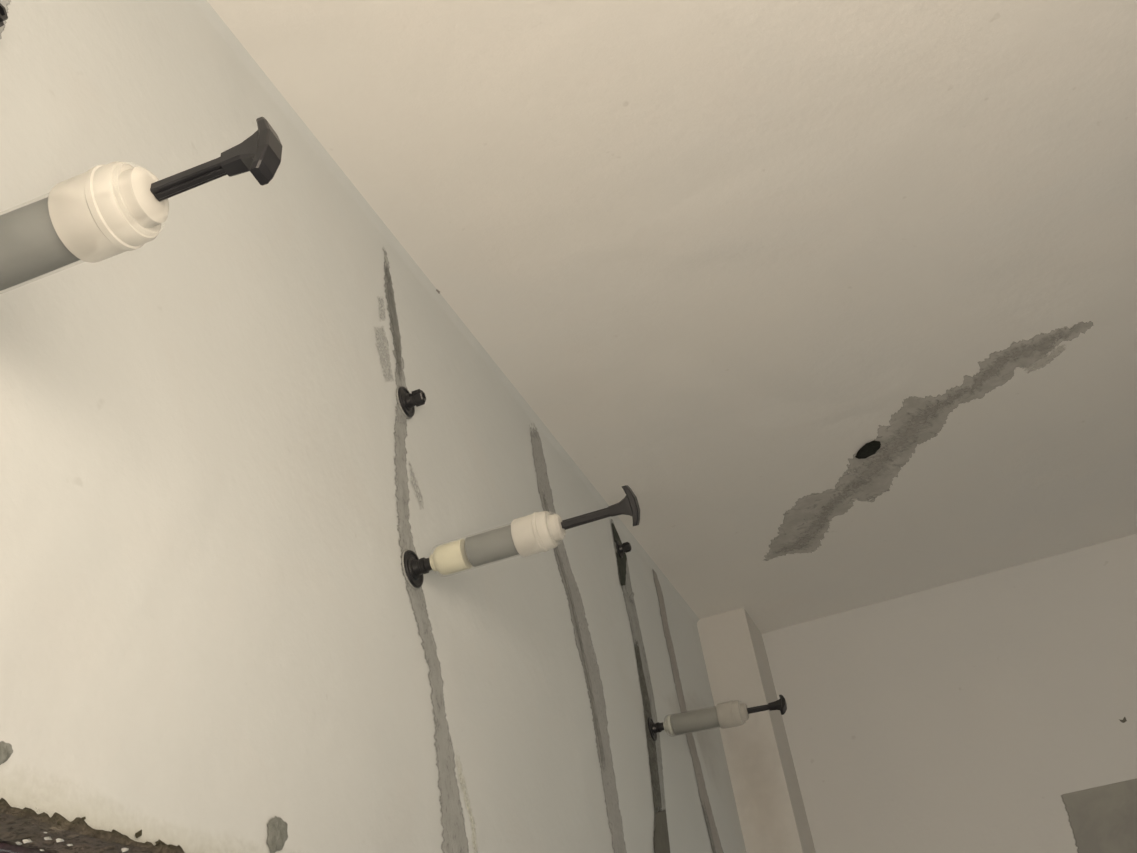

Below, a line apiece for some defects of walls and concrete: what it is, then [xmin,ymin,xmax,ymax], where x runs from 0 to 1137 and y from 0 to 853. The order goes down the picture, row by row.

crack [0,0,10,39]
spalling [0,798,185,853]
crack [384,251,469,853]
crack [530,428,627,853]
crack [611,519,723,853]